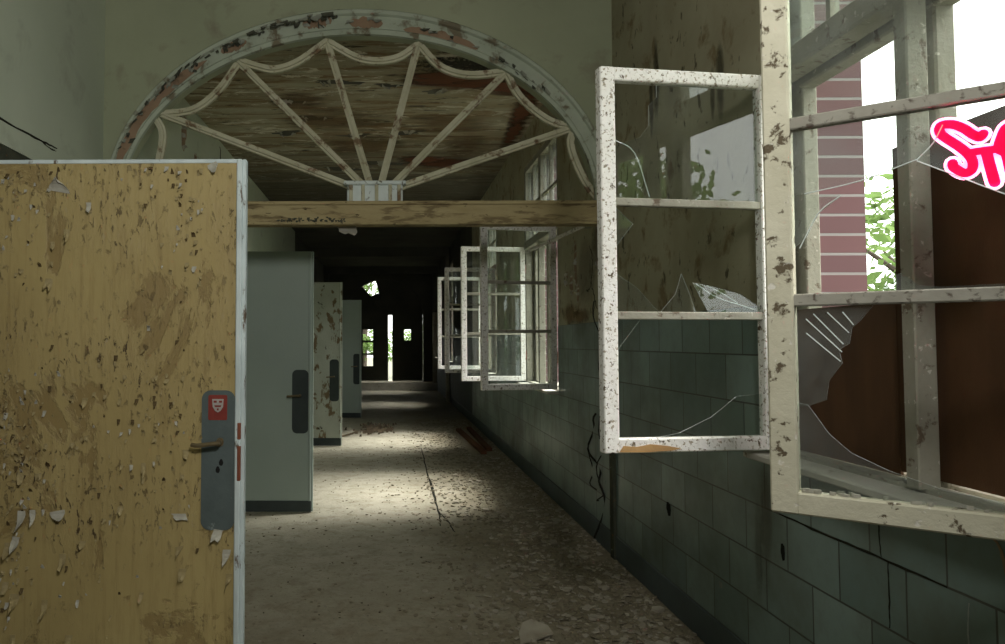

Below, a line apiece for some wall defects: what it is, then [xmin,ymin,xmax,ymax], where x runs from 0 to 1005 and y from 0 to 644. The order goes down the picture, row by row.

crack [0,117,57,151]
flaking render [116,12,383,313]
peeling [0,166,73,291]
peeling [0,367,124,629]
peeling [107,396,188,508]
crack [421,448,455,532]